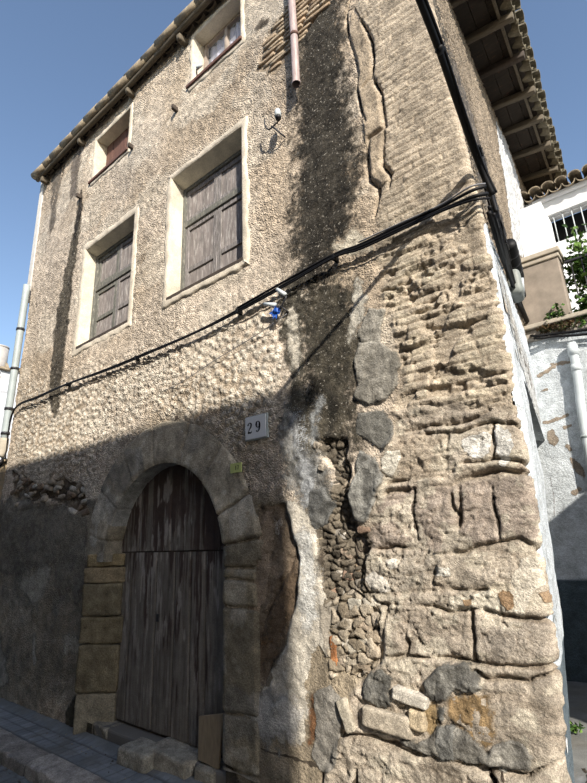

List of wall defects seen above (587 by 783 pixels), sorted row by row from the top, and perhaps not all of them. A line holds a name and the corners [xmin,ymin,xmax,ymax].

flaking render [256,0,330,75]
damp [49,145,83,417]
damp [250,0,374,755]
peeling [497,263,585,477]
flaking render [10,469,90,517]
flaking render [312,440,382,679]
crack [410,489,418,531]
crack [492,497,500,536]